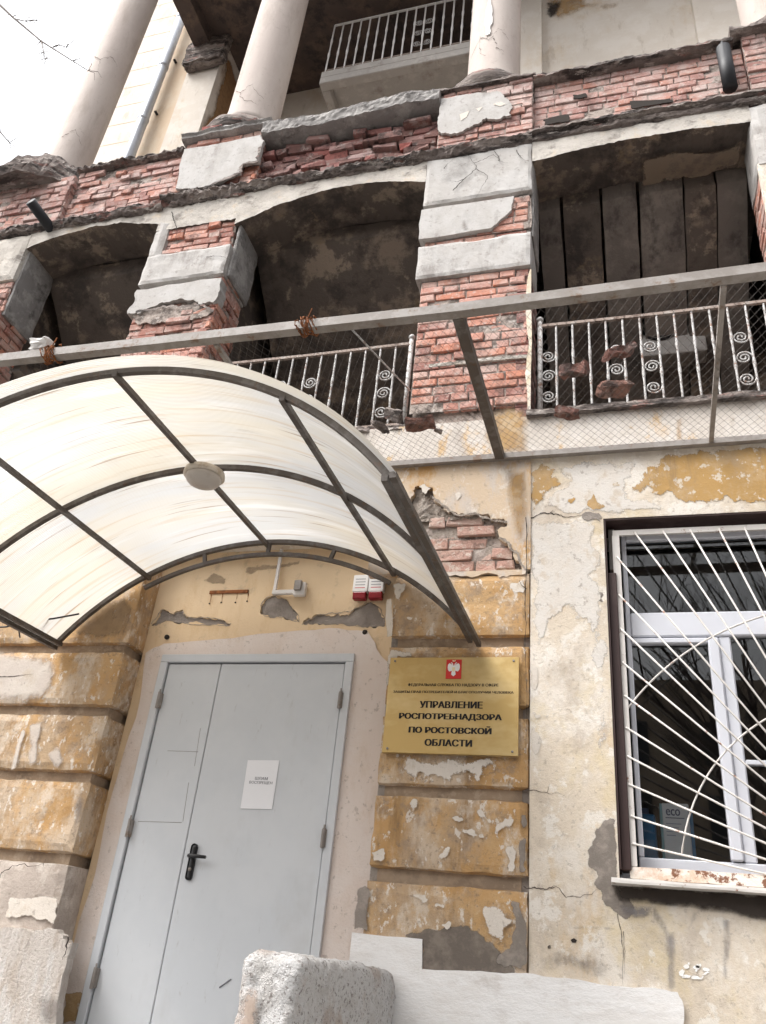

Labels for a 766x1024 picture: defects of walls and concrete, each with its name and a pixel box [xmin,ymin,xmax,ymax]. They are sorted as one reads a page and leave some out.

spalling [630,98,673,109]
spalling [543,114,570,125]
crack [444,150,528,198]
peeling [412,447,766,690]
spalling [151,610,231,627]
spalling [260,583,406,637]
peeling [404,757,493,781]
peeling [452,809,527,838]
peeling [372,848,385,861]
peeling [505,846,516,872]
crack [523,886,597,898]
peeling [5,896,57,924]